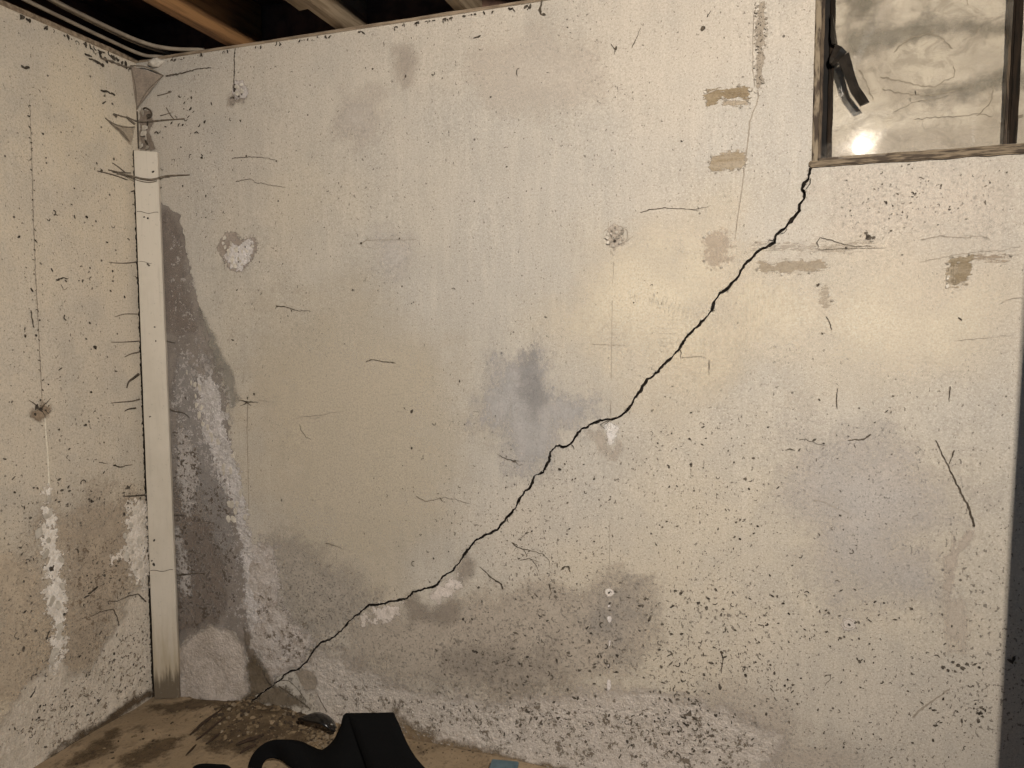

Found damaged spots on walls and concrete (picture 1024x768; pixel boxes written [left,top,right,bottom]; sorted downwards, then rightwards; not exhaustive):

leakage [0,418,152,768]
spalling [217,231,257,272]
leakage [161,204,838,768]
crack [246,168,812,712]